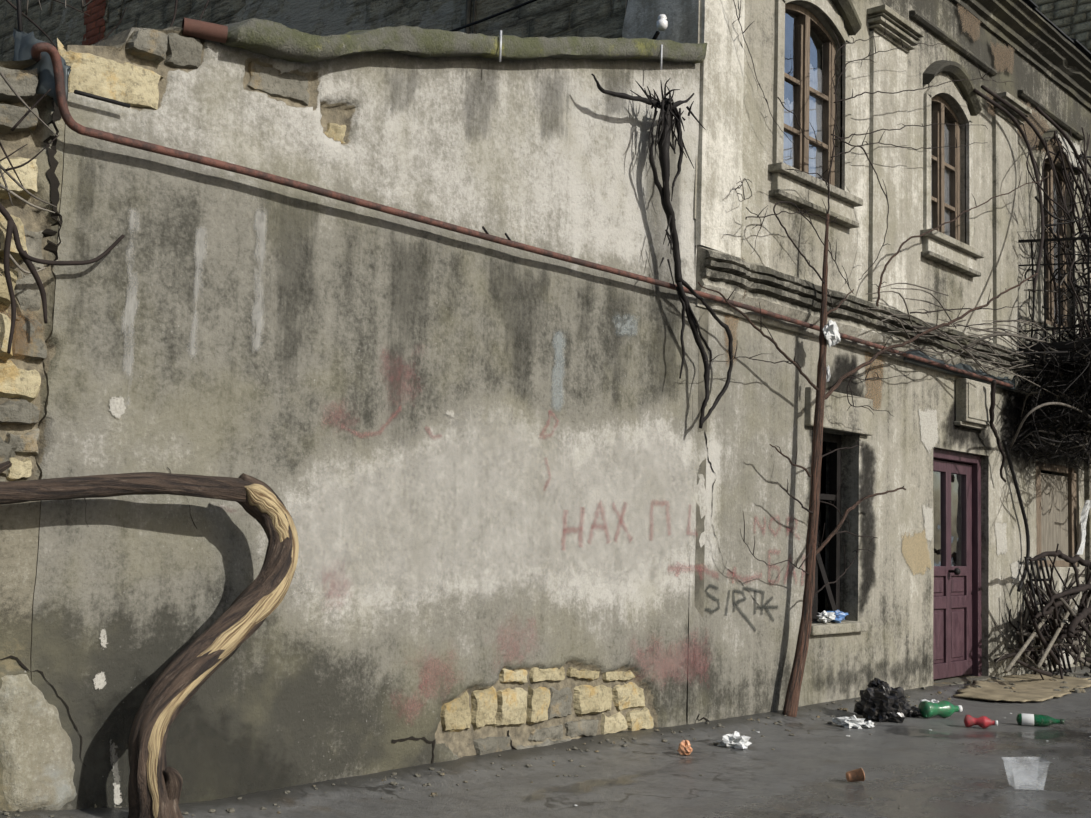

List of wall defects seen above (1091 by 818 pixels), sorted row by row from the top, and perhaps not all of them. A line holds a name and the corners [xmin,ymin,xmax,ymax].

spalling [57,29,203,110]
spalling [247,61,310,106]
spalling [325,123,346,144]
damp [123,251,138,374]
damp [195,228,205,299]
damp [252,211,266,350]
damp [859,443,876,611]
crack [0,655,86,767]
spalling [440,666,654,755]